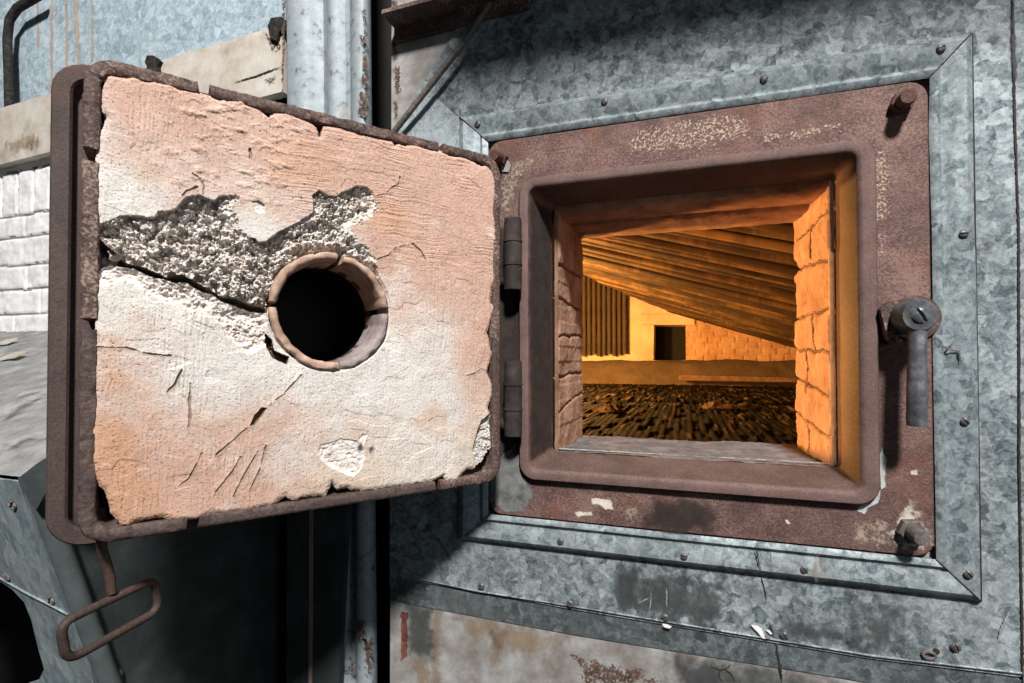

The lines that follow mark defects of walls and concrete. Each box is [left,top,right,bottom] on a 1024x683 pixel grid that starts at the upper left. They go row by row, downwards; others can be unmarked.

corrosion [344,9,368,117]
corrosion [392,39,402,119]
crack [100,240,267,313]
spalling [99,185,380,365]
peeling [318,433,368,477]
corrosion [400,611,408,661]
corrosion [571,654,662,683]